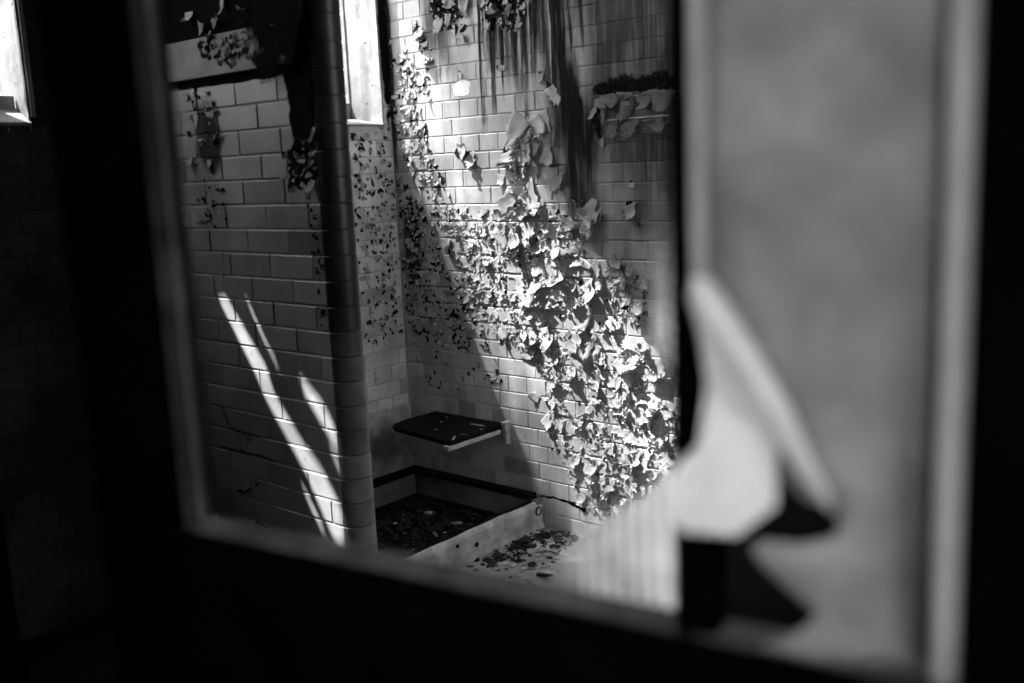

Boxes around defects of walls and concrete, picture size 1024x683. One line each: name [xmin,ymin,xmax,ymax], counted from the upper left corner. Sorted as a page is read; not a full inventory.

peeling [180,0,250,69]
peeling [184,87,227,229]
peeling [279,126,326,327]
peeling [350,0,673,516]
crack [215,398,275,494]